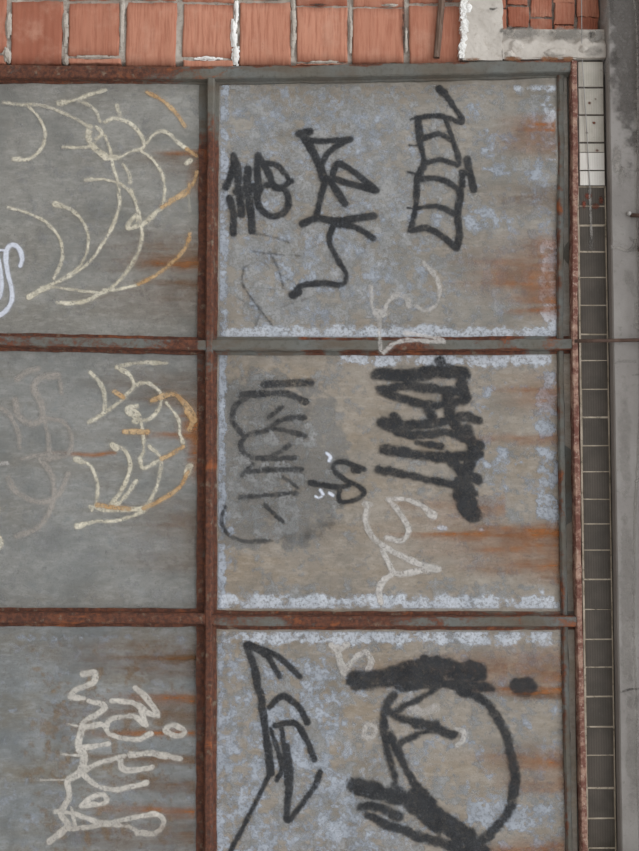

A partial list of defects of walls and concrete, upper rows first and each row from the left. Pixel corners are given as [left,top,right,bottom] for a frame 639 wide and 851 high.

flaking render [457,0,472,61]
flaking render [543,47,567,57]
rust [439,528,559,551]